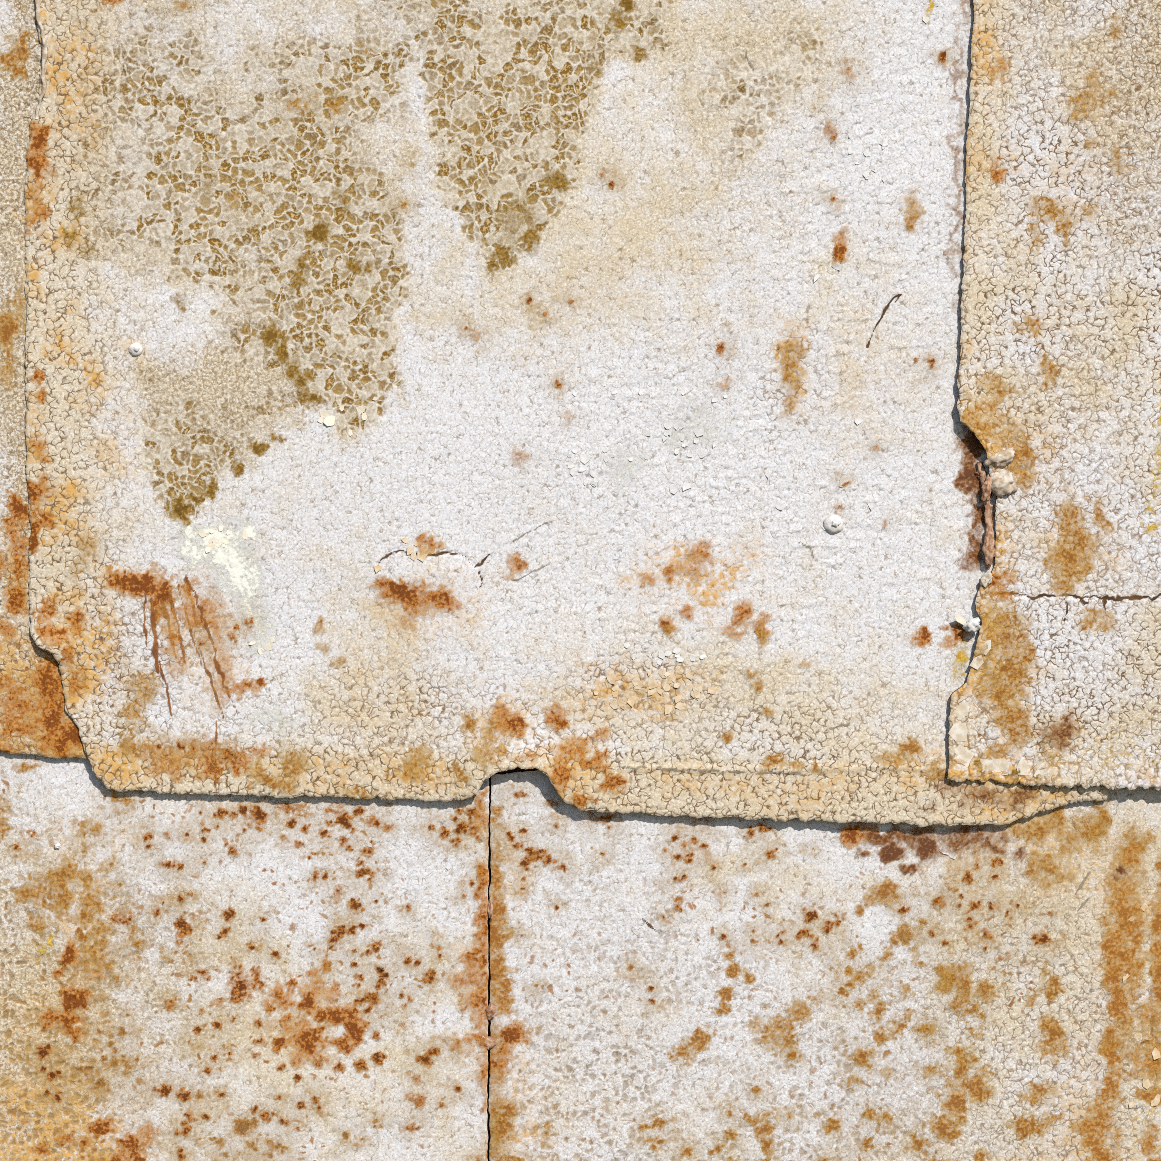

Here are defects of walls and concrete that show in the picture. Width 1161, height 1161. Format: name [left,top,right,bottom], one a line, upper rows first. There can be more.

peeling [317,397,378,426]
corrosion [0,440,89,772]
corrosion [370,576,462,625]
crack [378,521,552,587]
corrosion [912,621,969,648]
crack [993,591,1161,621]
corrosion [102,564,393,1082]
corrosion [543,703,627,829]
corrosion [15,857,210,1161]
corrosion [837,801,1113,1087]
corrosion [1010,826,1161,1161]
corrosion [910,1042,994,1161]